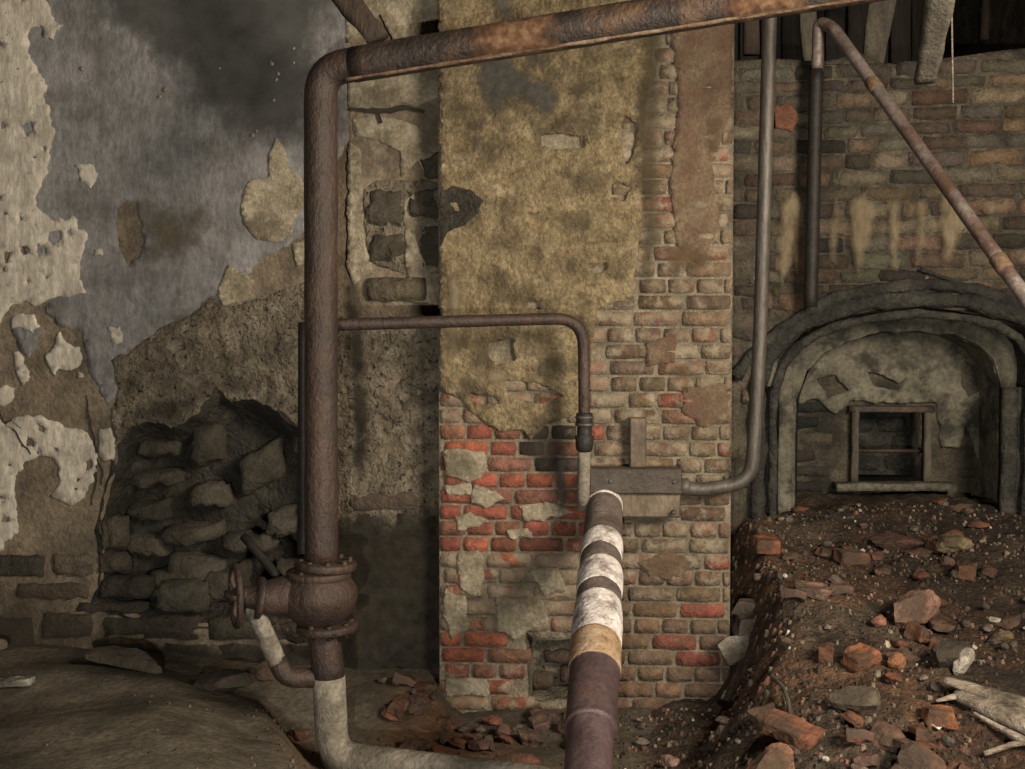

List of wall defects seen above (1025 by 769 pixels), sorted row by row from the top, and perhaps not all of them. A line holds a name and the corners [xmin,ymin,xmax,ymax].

peeling [293,0,362,69]
flaking render [363,0,630,40]
flaking render [670,24,735,267]
peeling [0,0,304,629]
flaking render [337,37,652,533]
flaking render [645,334,677,367]
flaking render [681,383,730,428]
flaking render [507,502,575,540]
flaking render [443,550,484,639]
spalling [496,567,571,702]
flaking render [445,677,490,697]